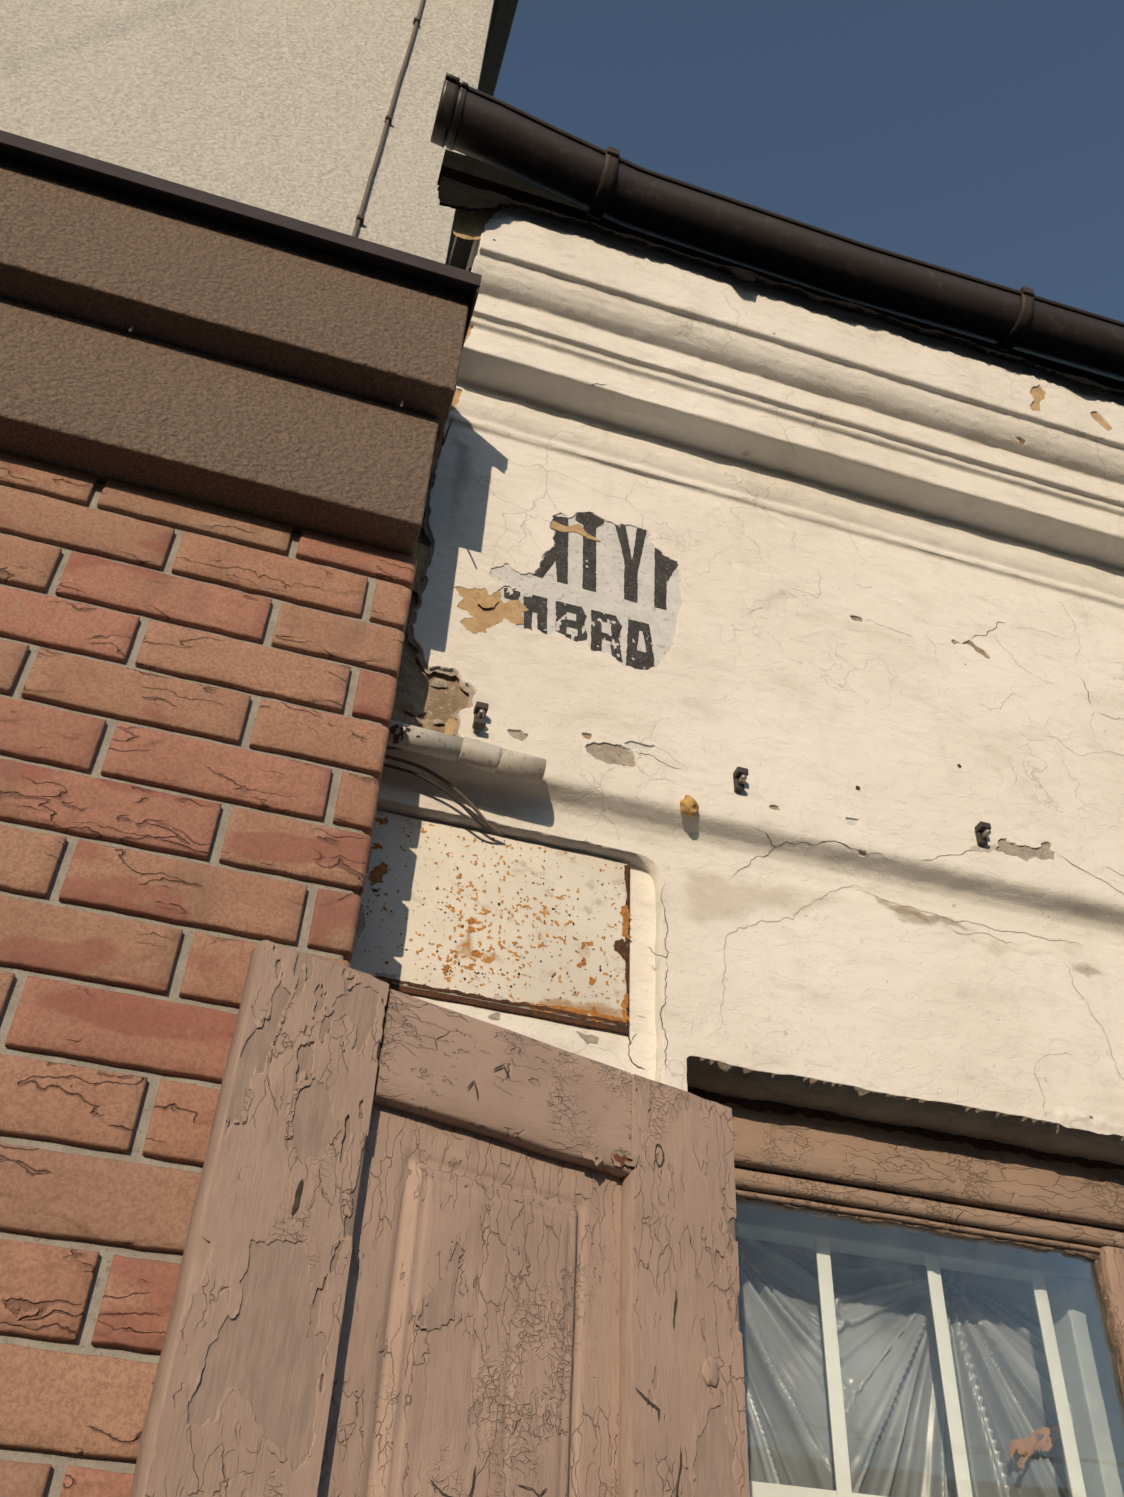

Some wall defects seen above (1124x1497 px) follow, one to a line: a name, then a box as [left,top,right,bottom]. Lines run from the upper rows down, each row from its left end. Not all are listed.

spalling [453,207,502,240]
peeling [1030,386,1046,411]
peeling [1091,412,1112,431]
spalling [391,442,476,737]
peeling [454,512,683,670]
peeling [582,734,678,769]
crack [988,596,1124,756]
corrosion [353,814,633,1026]
crack [715,829,1124,1080]
peeling [996,839,1124,895]
peeling [223,966,294,1138]
peeling [582,1150,638,1167]